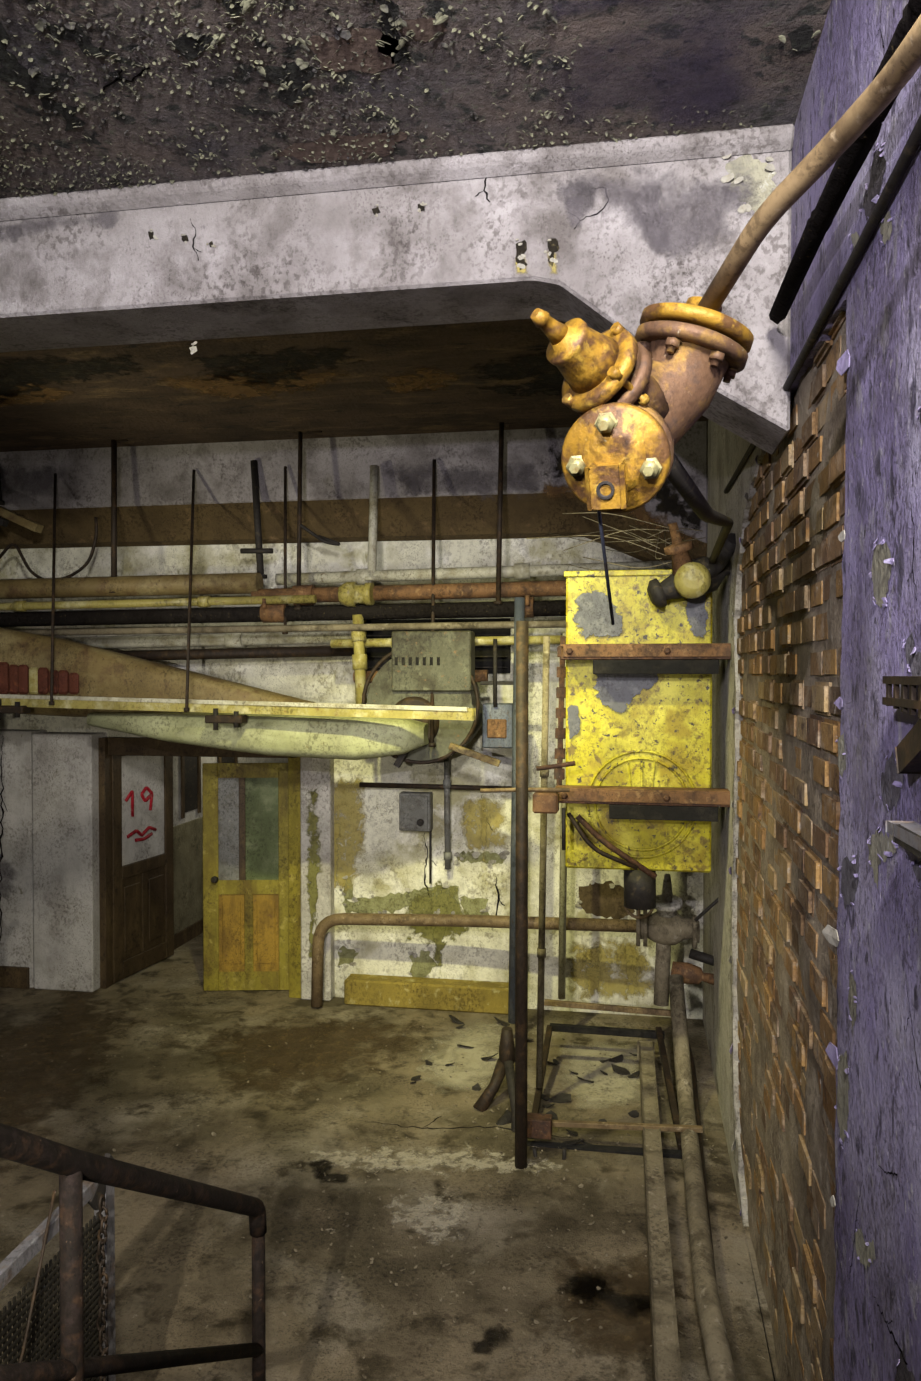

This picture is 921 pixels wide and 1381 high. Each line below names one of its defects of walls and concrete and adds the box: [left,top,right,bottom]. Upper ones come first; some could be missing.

water stain [563,179,749,251]
peeling [902,618,921,693]
water stain [306,779,366,958]
water stain [462,799,507,861]
spalling [685,311,903,1381]
water stain [405,881,469,967]
peeling [895,1350,915,1381]